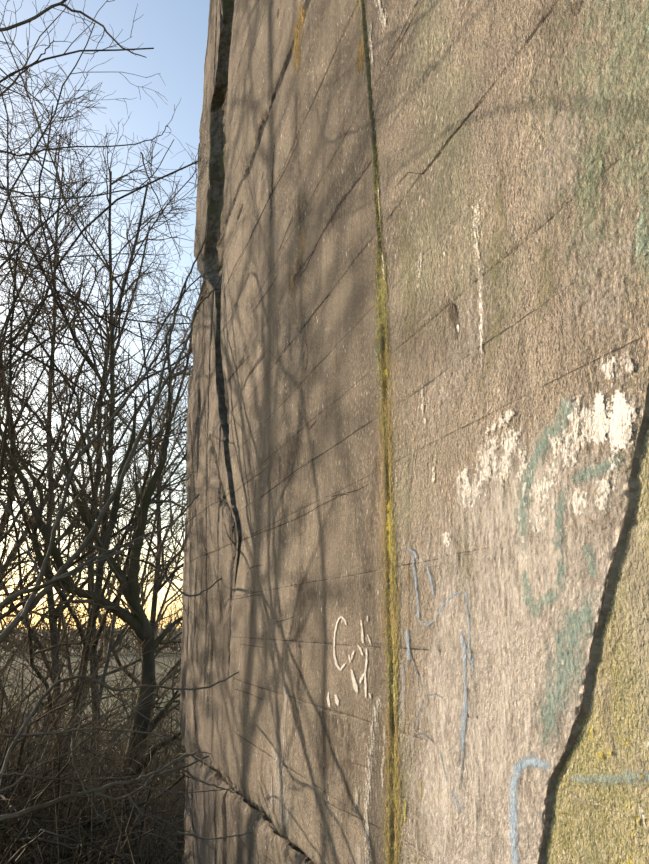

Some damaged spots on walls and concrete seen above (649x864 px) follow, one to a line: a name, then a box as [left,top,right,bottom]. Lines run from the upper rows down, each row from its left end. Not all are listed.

crack [225,0,311,289]
spalling [180,0,238,864]
crack [182,294,376,864]